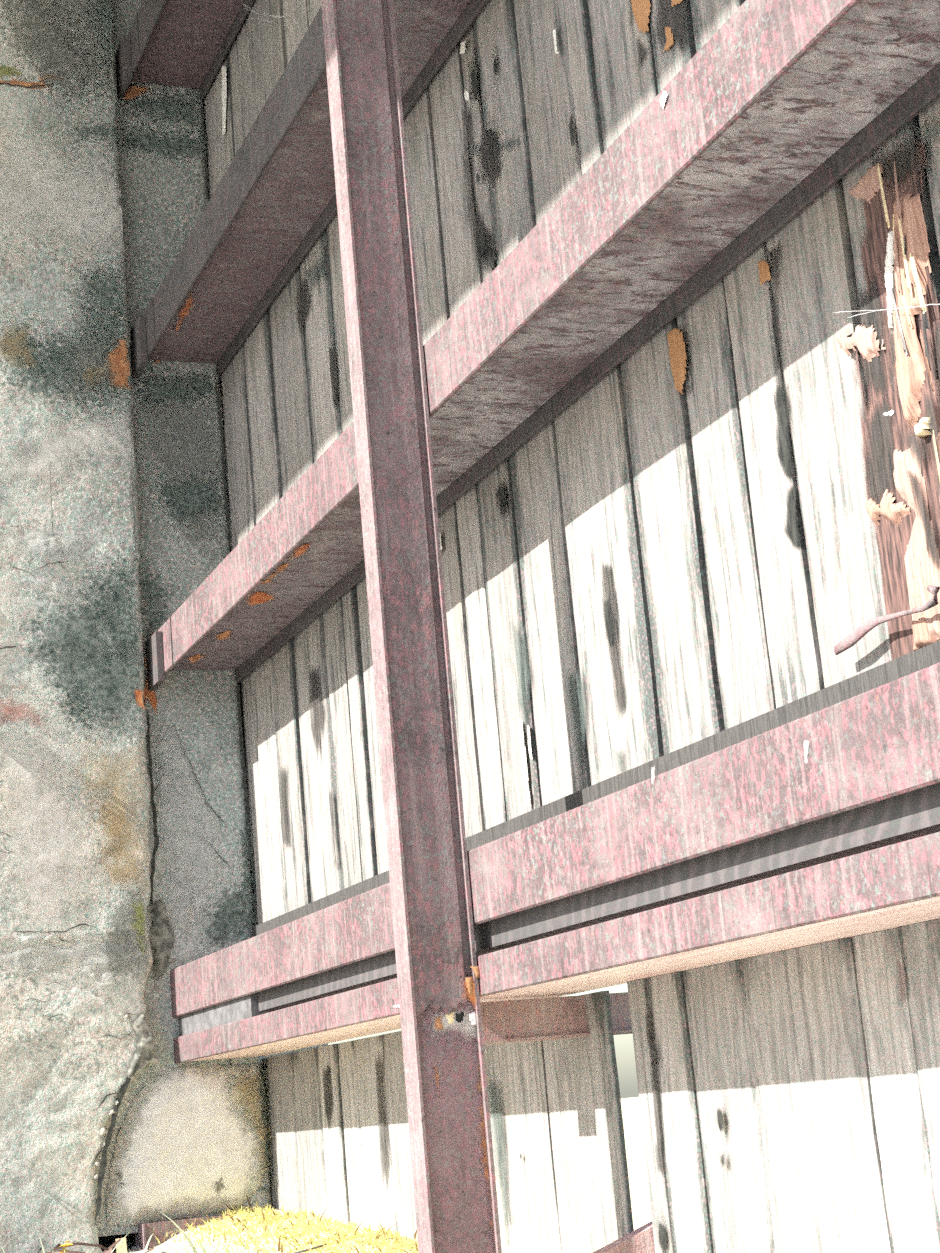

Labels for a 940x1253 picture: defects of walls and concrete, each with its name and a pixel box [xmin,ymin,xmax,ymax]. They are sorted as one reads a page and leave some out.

peeling [629,0,686,66]
rust [0,75,60,88]
water stain [2,0,209,159]
rust [109,340,130,387]
peeling [667,328,690,394]
rust [249,544,308,605]
water stain [22,549,175,743]